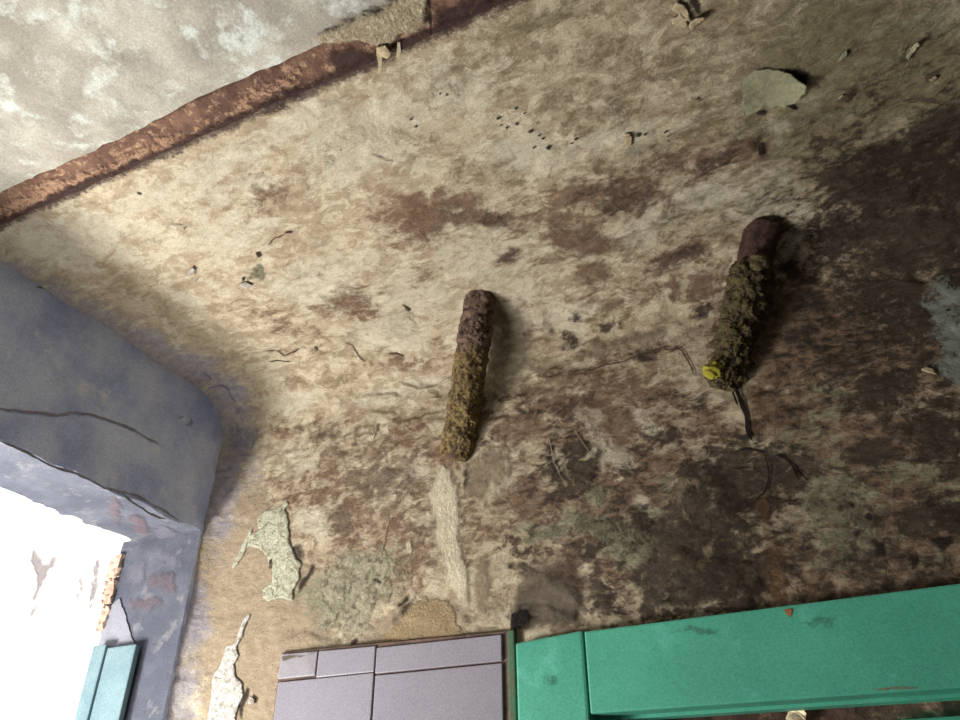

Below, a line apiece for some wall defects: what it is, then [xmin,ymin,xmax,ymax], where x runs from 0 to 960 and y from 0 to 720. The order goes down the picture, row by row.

rust [0,0,530,231]
peeling [741,68,808,116]
damp [575,183,671,215]
damp [849,119,960,231]
damp [499,248,520,262]
damp [550,224,622,285]
crack [0,408,159,445]
crack [0,440,182,522]
damp [550,392,634,482]
flaking render [232,501,314,602]
damp [657,457,769,611]
flaking render [207,614,255,720]